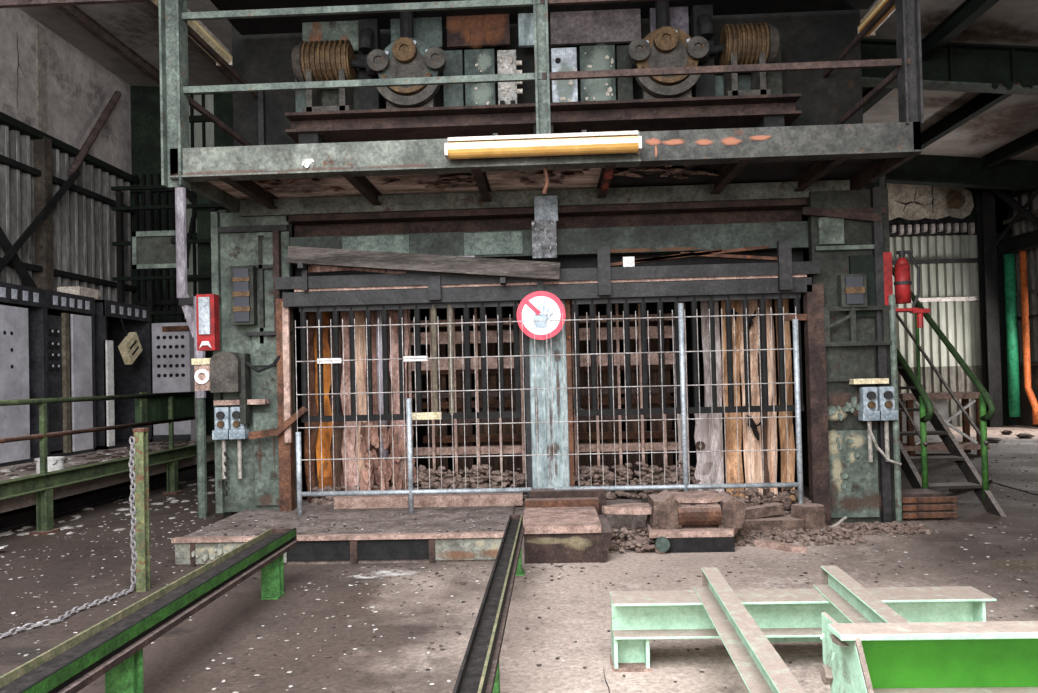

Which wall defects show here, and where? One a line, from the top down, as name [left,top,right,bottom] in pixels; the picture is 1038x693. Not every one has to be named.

rust [646,138,683,156]
rust [696,135,770,145]
peeling [828,397,865,490]